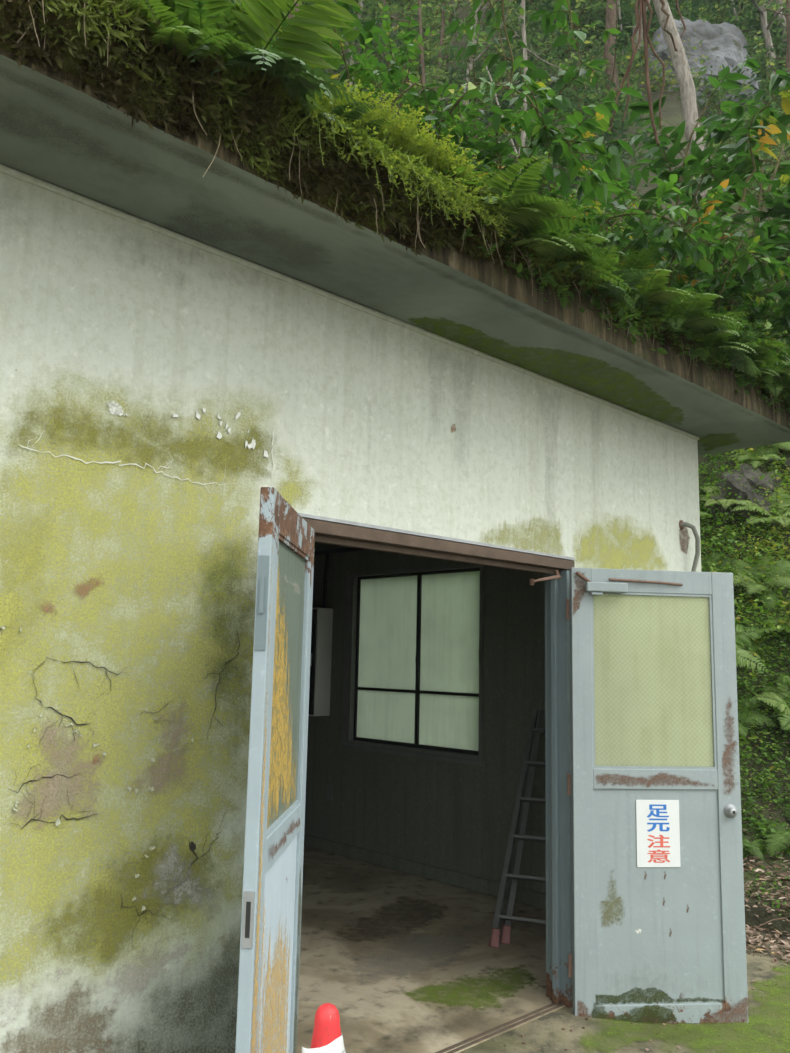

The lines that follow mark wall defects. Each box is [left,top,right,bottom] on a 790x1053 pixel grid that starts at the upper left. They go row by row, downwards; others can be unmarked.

spalling [107,401,128,416]
crack [18,430,229,494]
spalling [195,407,241,439]
spalling [245,427,269,458]
corrosion [680,528,690,553]
crack [140,627,253,747]
crack [9,657,127,829]
corrosion [723,702,736,793]
corrosion [596,773,707,787]
leakage [3,939,240,1053]